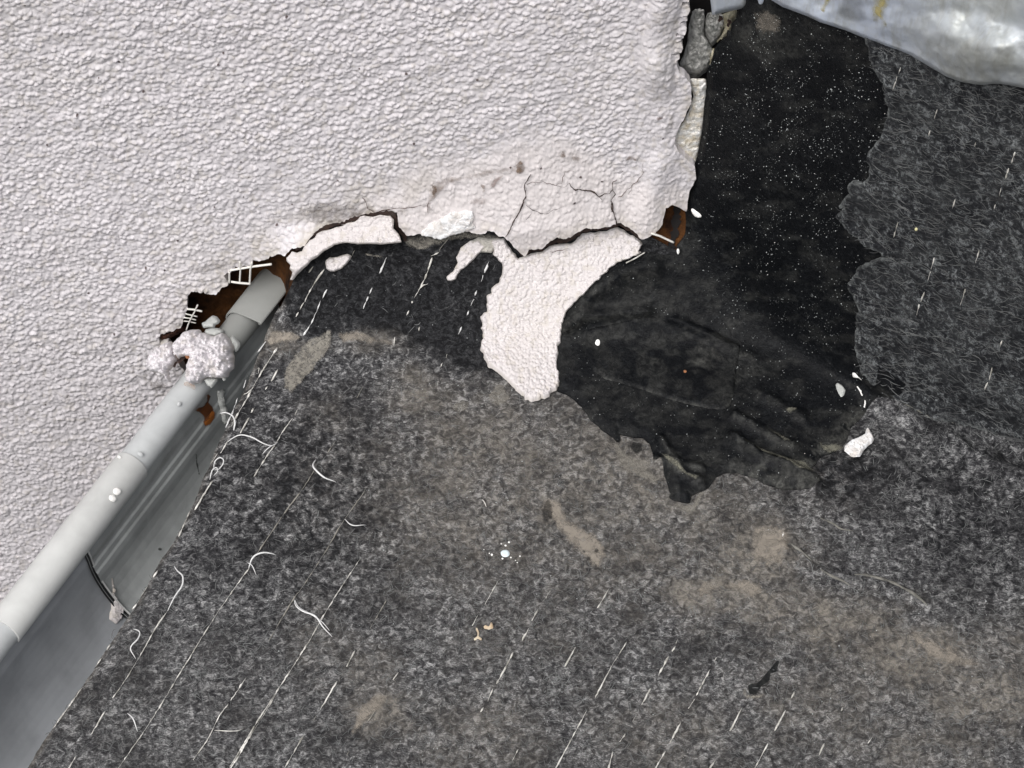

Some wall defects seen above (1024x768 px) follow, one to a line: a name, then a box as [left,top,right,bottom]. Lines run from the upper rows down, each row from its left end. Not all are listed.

spalling [421,210,475,239]
crack [505,164,644,256]
spalling [651,205,686,250]
spalling [168,215,401,352]
corrosion [160,326,186,340]
corrosion [196,394,215,426]
damp [616,443,655,483]